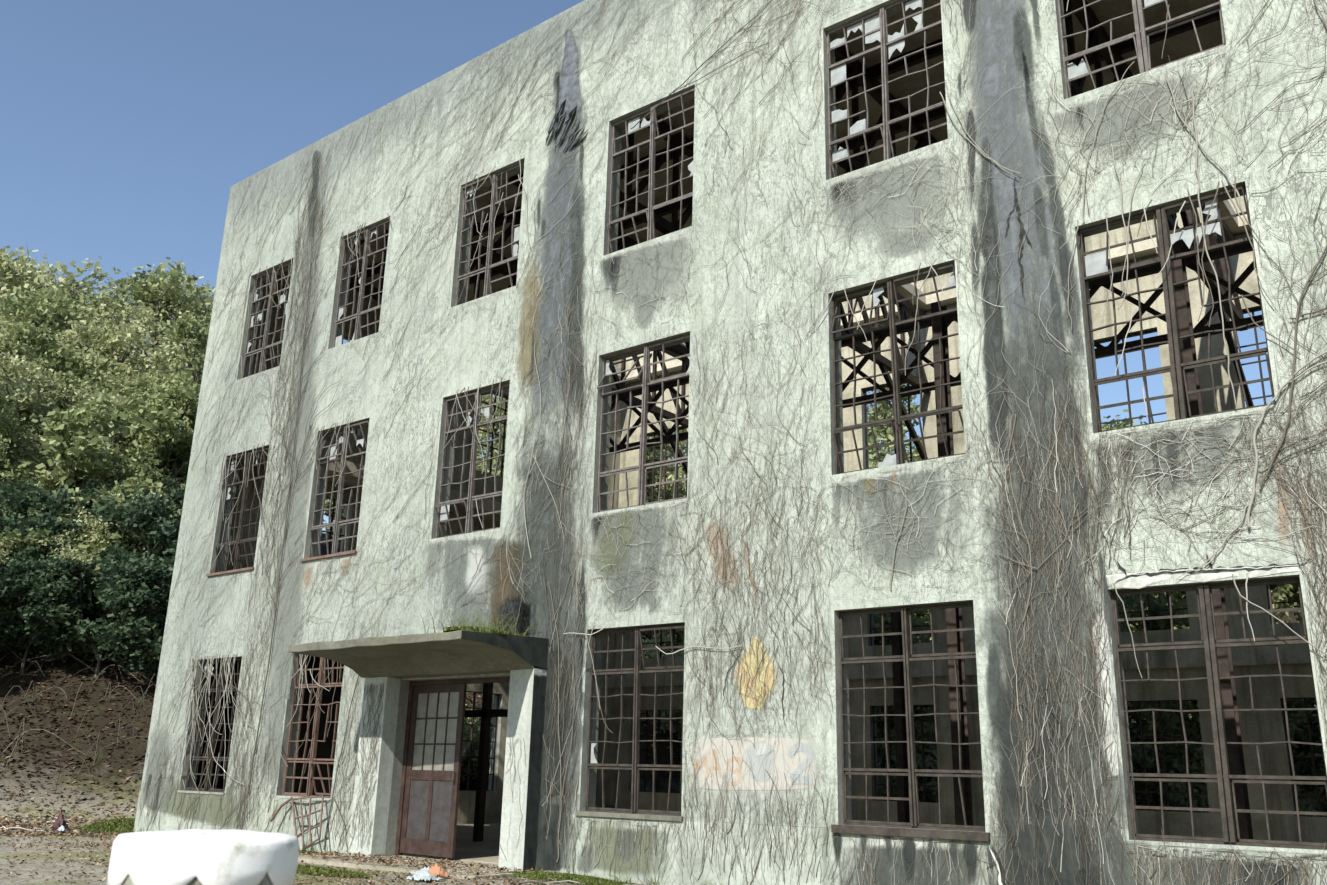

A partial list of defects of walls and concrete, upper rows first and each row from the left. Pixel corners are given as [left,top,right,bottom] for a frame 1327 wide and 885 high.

water stain [520,71,584,415]
water stain [429,435,675,872]
water stain [833,0,1245,885]
water stain [1161,859,1294,885]